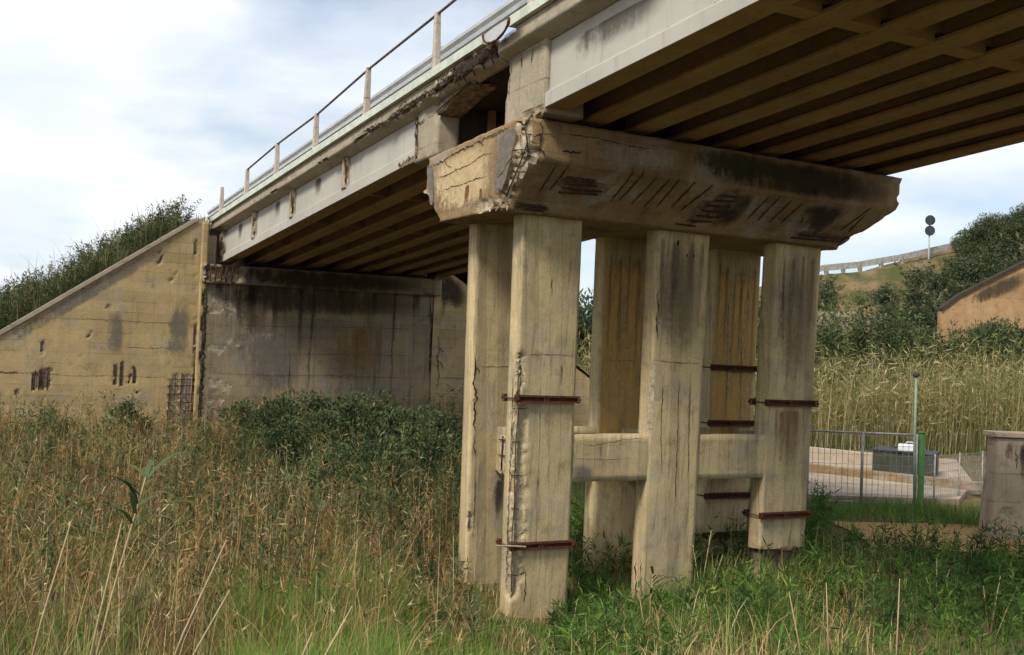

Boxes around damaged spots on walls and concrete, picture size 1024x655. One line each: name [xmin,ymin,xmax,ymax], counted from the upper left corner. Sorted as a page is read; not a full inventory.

spalling [353,39,504,168]
spalling [475,104,549,214]
crack [361,47,713,211]
damp [700,152,869,233]
spalling [14,367,53,395]
spalling [112,361,138,394]
damp [170,312,186,348]
spalling [166,237,273,431]
damp [216,269,404,386]
crack [199,286,526,603]
spalling [498,353,529,598]